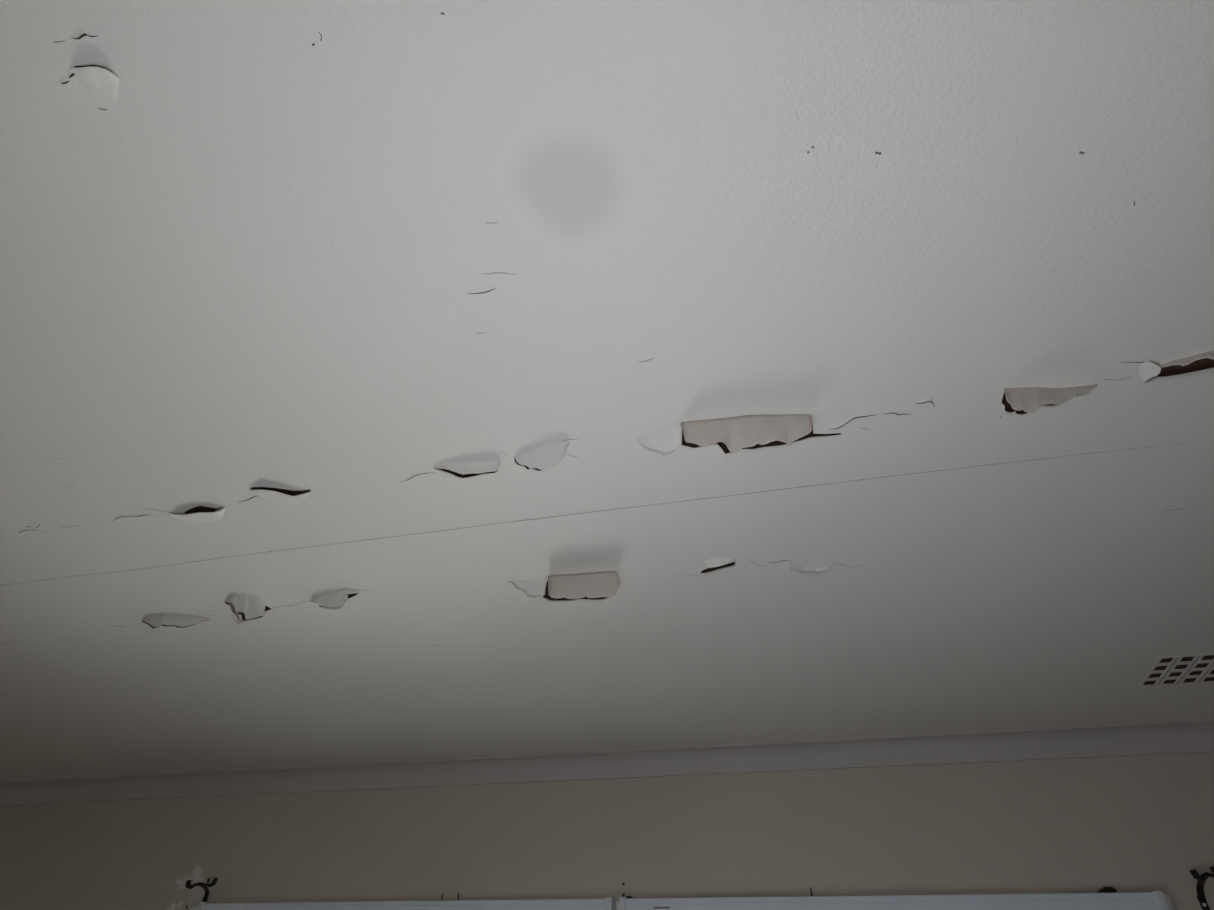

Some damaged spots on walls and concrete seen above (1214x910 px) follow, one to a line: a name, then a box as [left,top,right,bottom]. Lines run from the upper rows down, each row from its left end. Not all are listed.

peeling [59,65,119,105]
peeling [1000,351,1214,418]
crack [828,397,935,431]
peeling [637,414,841,457]
peeling [400,437,579,484]
peeling [170,487,312,524]
peeling [508,571,621,602]
peeling [677,557,736,576]
peeling [142,589,370,630]